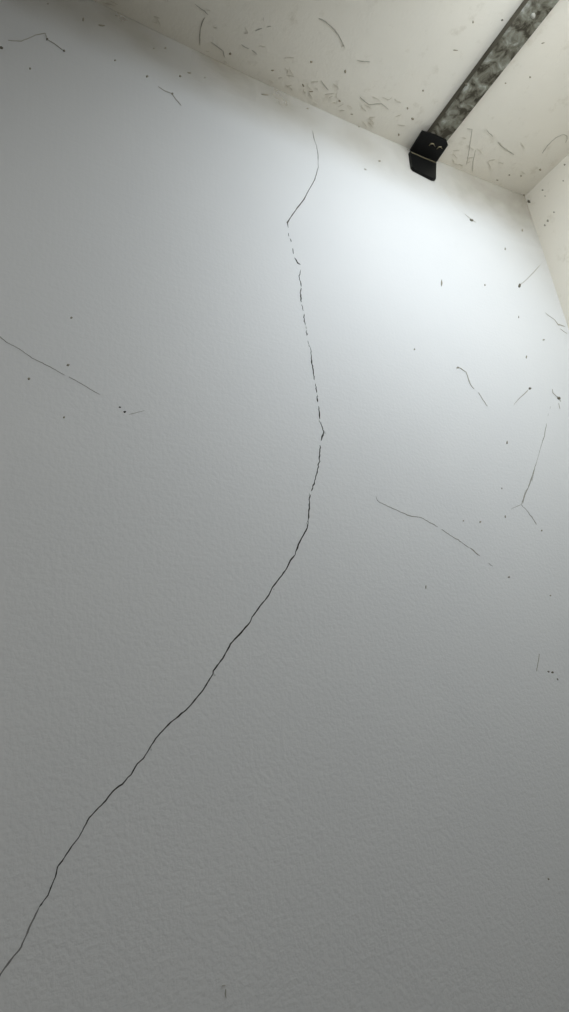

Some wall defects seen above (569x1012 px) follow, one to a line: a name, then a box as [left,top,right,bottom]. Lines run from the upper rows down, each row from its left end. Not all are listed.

crack [0,135,326,976]